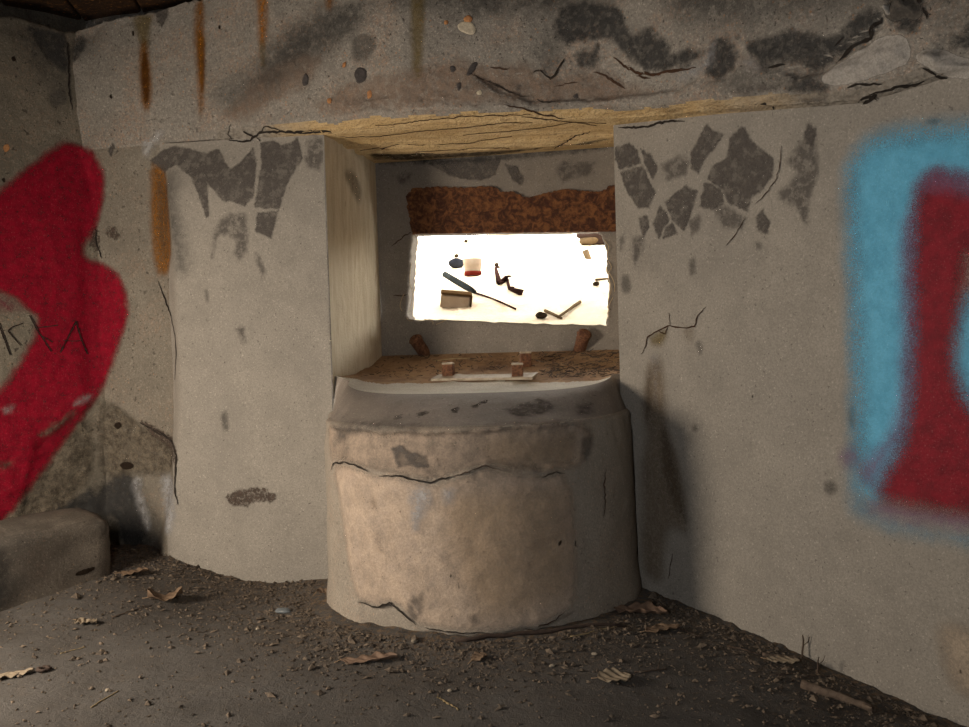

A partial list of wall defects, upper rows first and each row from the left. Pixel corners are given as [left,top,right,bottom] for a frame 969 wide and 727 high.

rust [136,17,150,109]
rust [196,2,204,99]
crack [227,57,696,152]
crack [834,18,882,63]
crack [847,68,948,105]
rust [152,166,171,273]
crack [158,282,176,380]
crack [641,308,704,354]
crack [331,461,502,484]
crack [360,602,483,634]